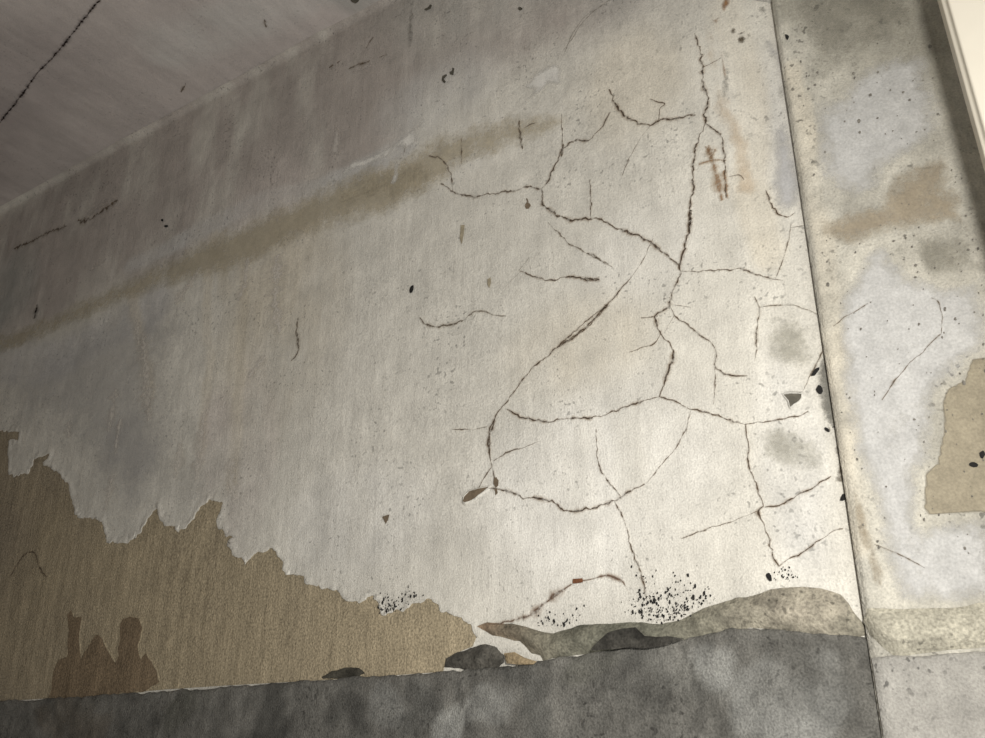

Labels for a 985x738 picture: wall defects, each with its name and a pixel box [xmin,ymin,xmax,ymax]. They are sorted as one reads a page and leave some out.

crack [0,0,100,123]
crack [14,201,117,249]
leakage [54,127,531,328]
corrosion [700,145,728,201]
leakage [826,165,978,253]
crack [420,35,865,625]
crack [882,301,943,400]
peeling [925,358,985,514]
peeling [0,424,504,701]